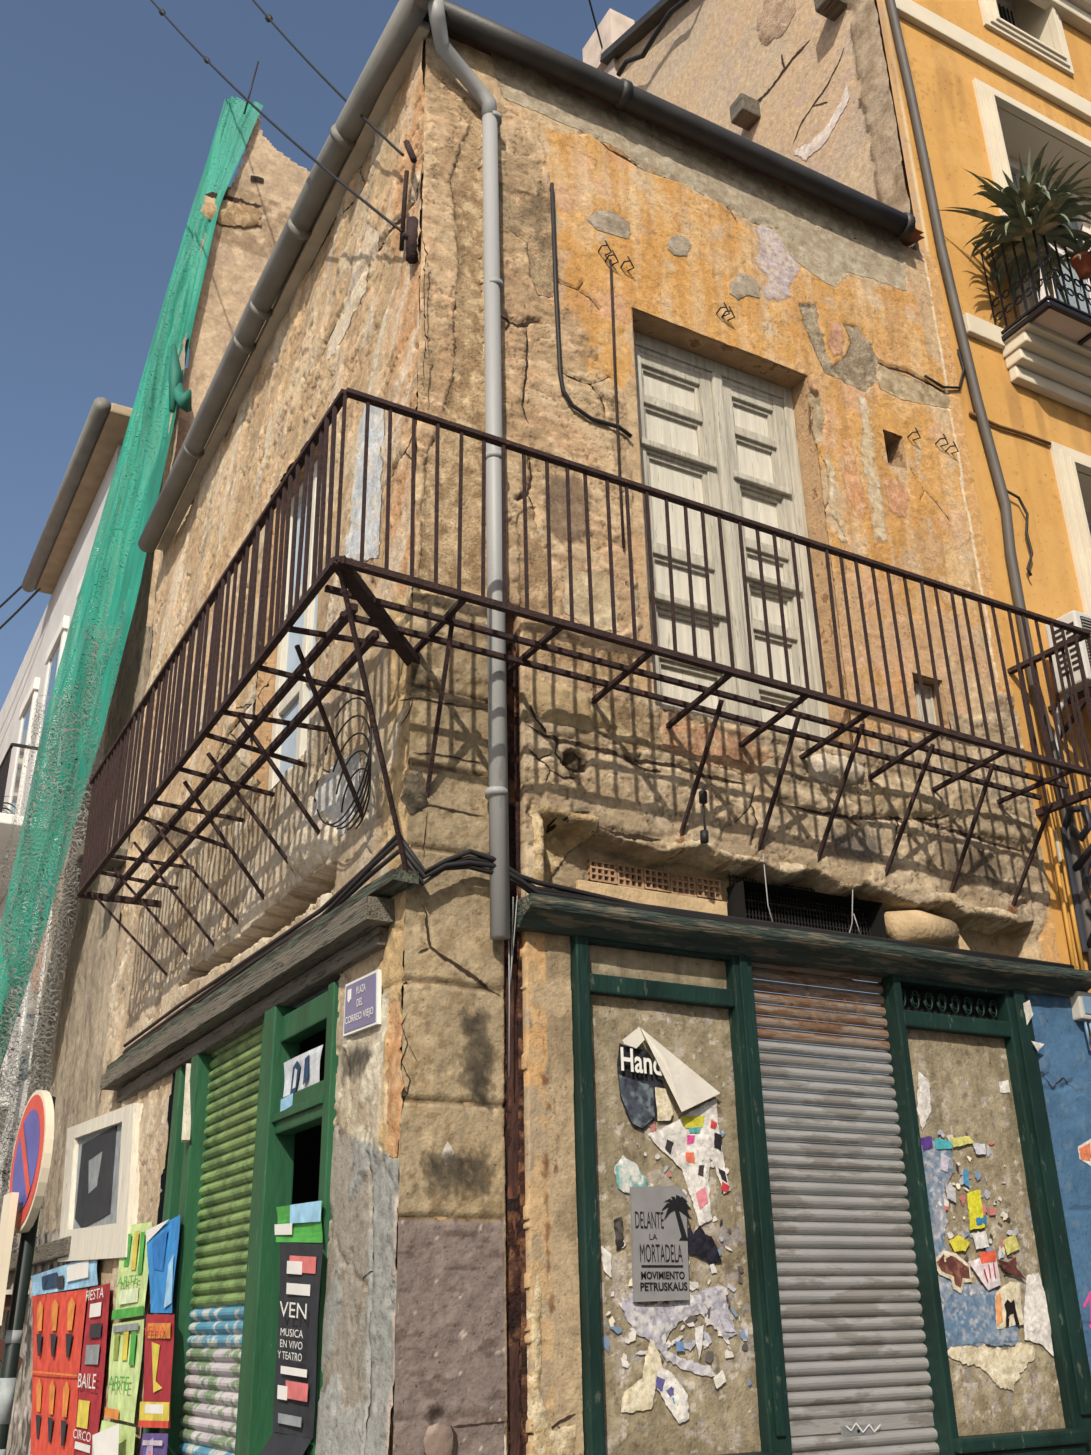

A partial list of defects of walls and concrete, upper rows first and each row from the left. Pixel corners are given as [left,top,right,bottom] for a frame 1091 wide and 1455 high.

peeling [491,51,952,408]
crack [501,316,539,423]
crack [562,373,610,414]
crack [525,705,1027,852]
crack [418,905,499,995]
flaking render [529,804,599,888]
spalling [654,840,868,897]
spalling [921,892,1018,935]
rust [505,962,519,1199]
rust [507,1340,521,1455]